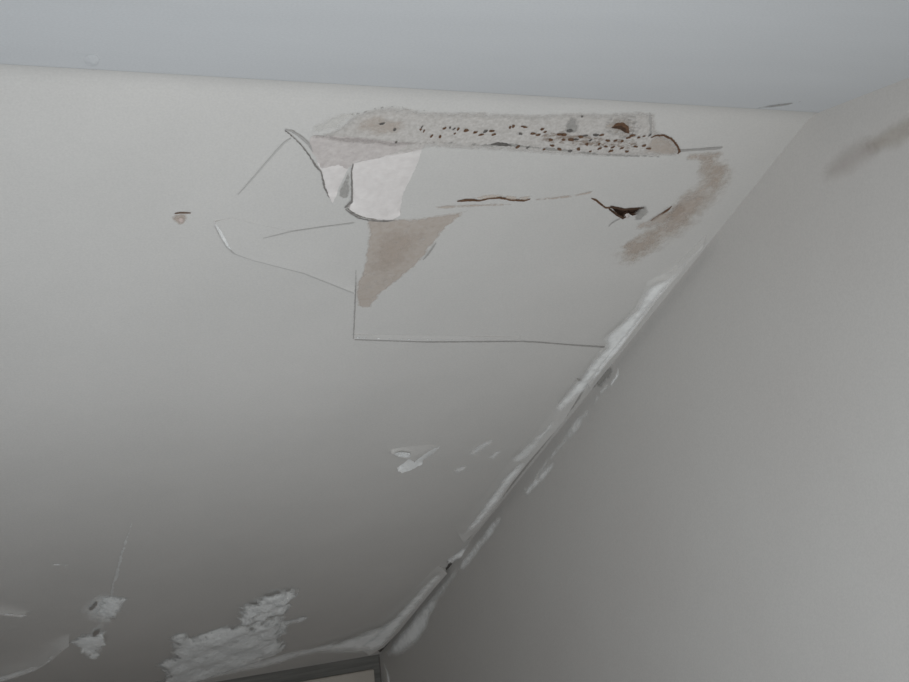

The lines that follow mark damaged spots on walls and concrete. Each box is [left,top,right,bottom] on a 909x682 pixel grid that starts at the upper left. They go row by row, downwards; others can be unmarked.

peeling [285,106,681,226]
crack [440,192,591,208]
water stain [358,215,459,307]
peeling [325,236,706,655]
peeling [71,630,105,659]
peeling [89,597,126,617]